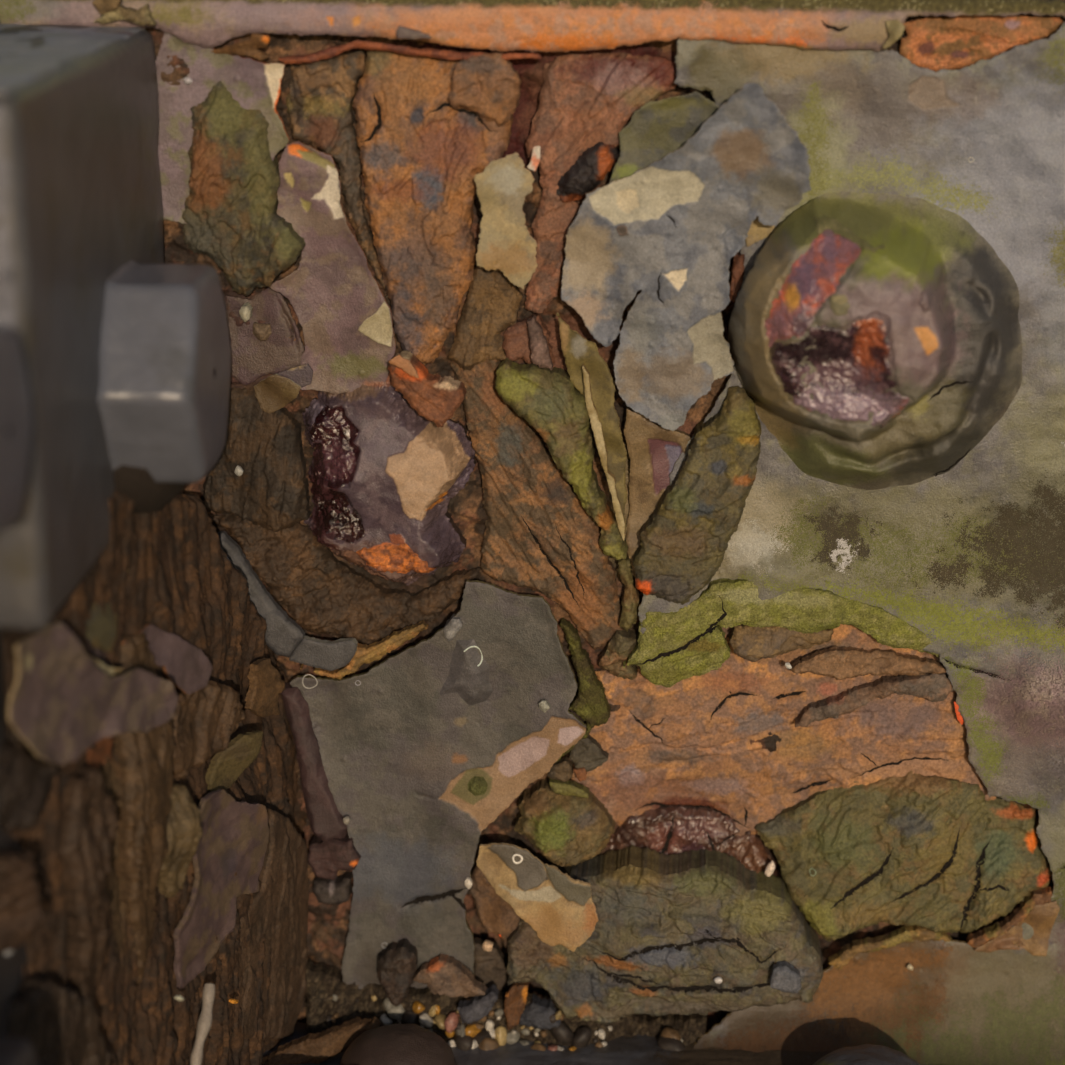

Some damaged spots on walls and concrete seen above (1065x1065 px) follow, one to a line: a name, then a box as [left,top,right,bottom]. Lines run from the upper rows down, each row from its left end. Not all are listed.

peeling [92,0,467,582]
peeling [474,146,540,289]
rust [214,0,828,247]
rust [424,256,642,540]
peeling [502,82,811,632]
rust [677,374,731,437]
rust [764,229,910,429]
peeling [173,789,270,990]
rust [0,373,464,1065]
peeling [476,842,598,952]
rust [333,457,996,865]
spalling [607,805,783,879]